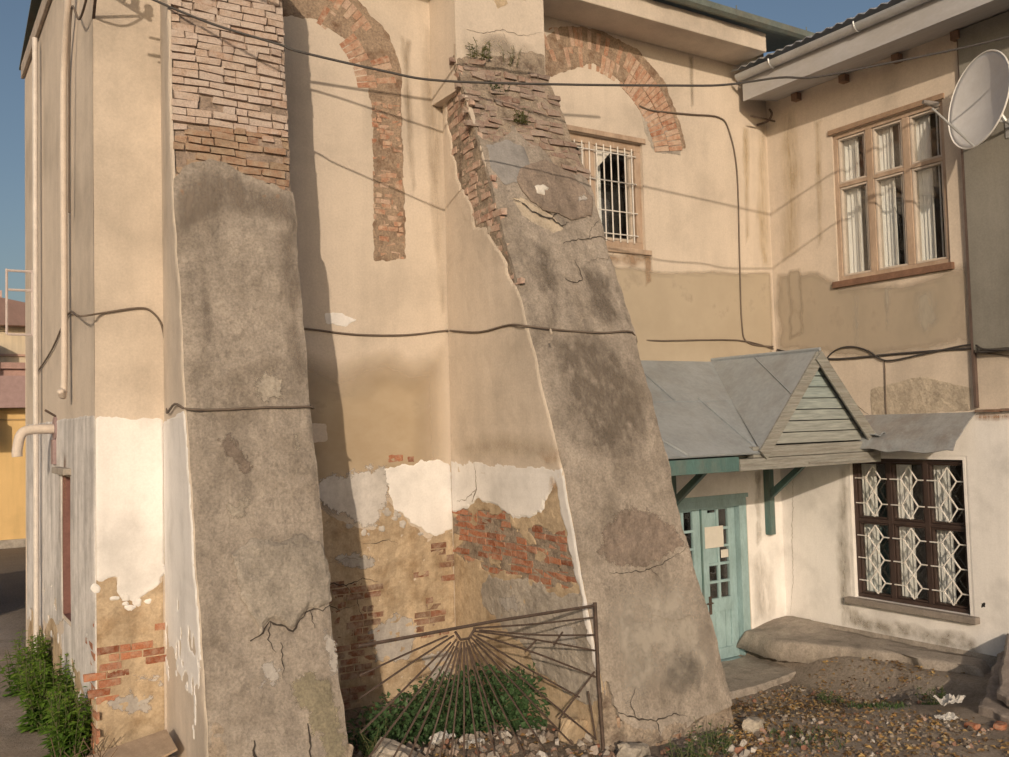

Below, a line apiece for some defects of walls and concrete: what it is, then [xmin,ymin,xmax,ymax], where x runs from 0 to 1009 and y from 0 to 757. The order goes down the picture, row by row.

flaking render [173,126,290,198]
spalling [447,51,563,285]
spalling [388,455,414,463]
crack [250,540,397,676]
peeling [321,480,735,751]
peeling [28,564,166,754]
spalling [260,662,281,688]
crack [305,723,313,757]
crack [618,687,687,733]